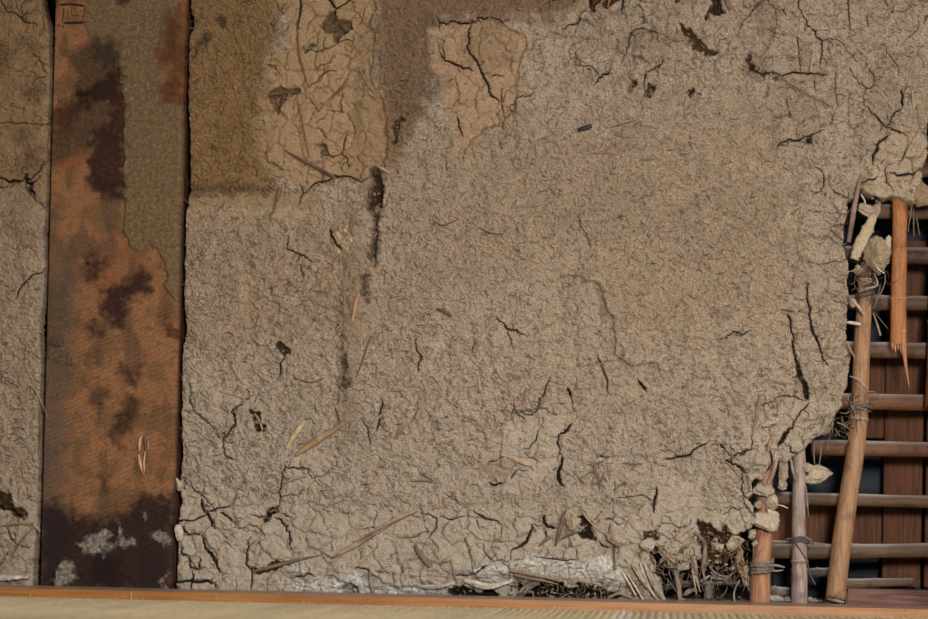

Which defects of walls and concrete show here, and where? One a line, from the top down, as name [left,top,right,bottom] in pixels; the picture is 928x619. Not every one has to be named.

water stain [78,41,126,198]
crack [271,0,365,85]
crack [436,14,534,136]
crack [712,0,919,198]
crack [298,95,378,264]
water stain [101,270,152,327]
crack [185,384,258,460]
crack [487,379,574,487]
water stain [41,494,176,589]
crack [174,462,328,590]
crack [357,493,578,583]
crack [594,481,691,548]